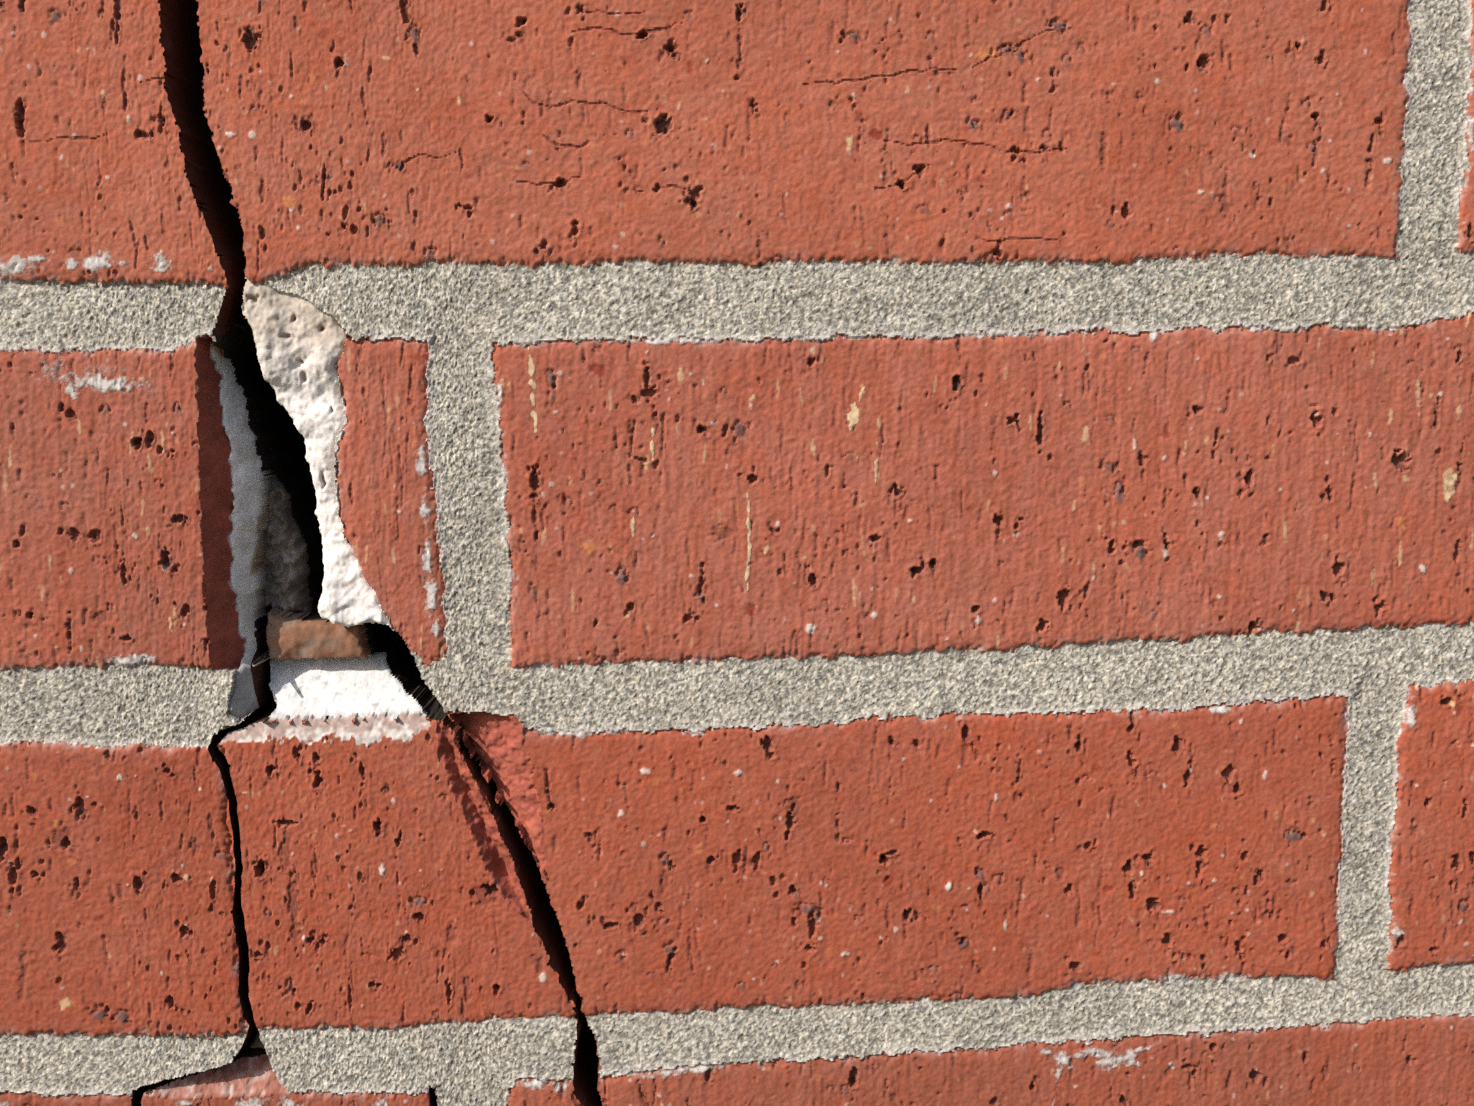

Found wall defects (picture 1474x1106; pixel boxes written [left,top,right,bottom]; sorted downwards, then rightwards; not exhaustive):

crack [571,9,684,38]
crack [515,91,659,187]
crack [635,184,692,193]
crack [131,0,603,1106]
spalling [193,276,628,923]
crack [652,1078,691,1106]